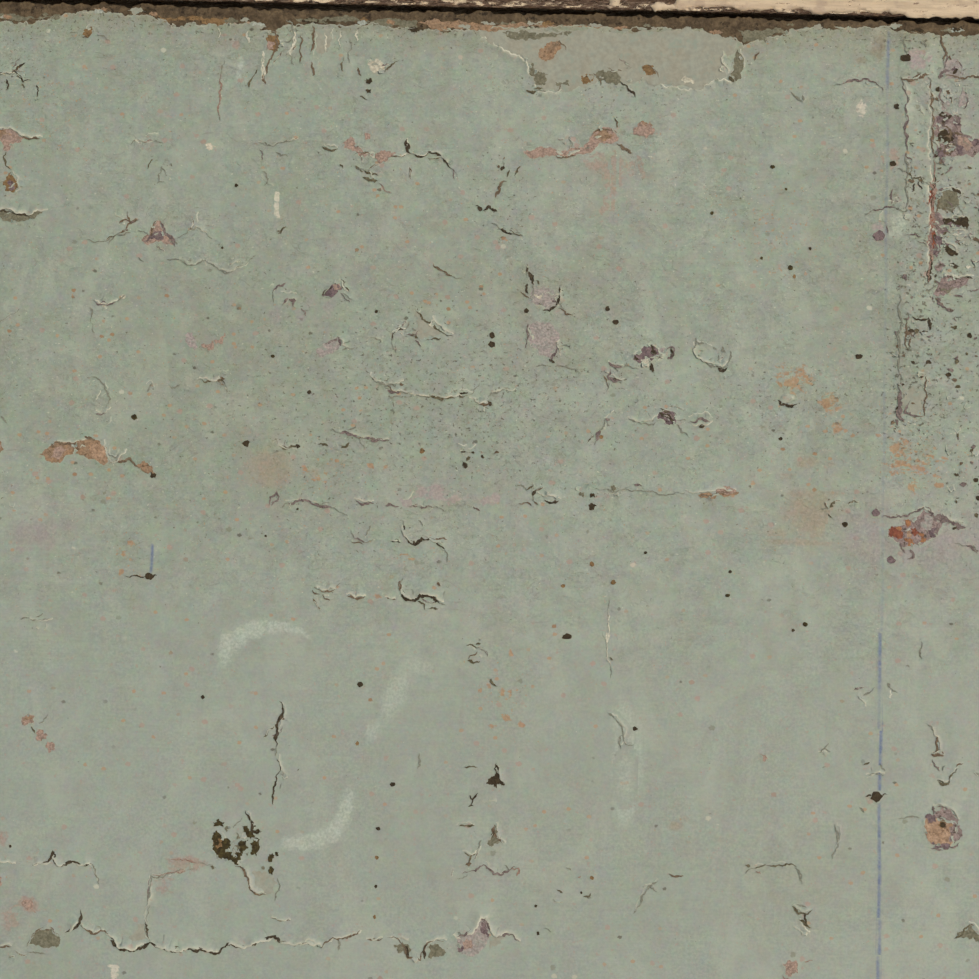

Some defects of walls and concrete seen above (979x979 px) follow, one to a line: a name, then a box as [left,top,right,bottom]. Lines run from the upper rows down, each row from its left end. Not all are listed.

peeling [0,1,979,100]
peeling [0,116,48,224]
peeling [518,119,655,164]
peeling [929,55,979,164]
peeling [920,180,979,300]
peeling [628,339,675,372]
peeling [35,431,156,478]
peeling [884,500,968,560]
crack [261,698,299,804]
peeling [483,761,509,792]
peeling [208,807,281,899]
spalling [900,796,966,851]